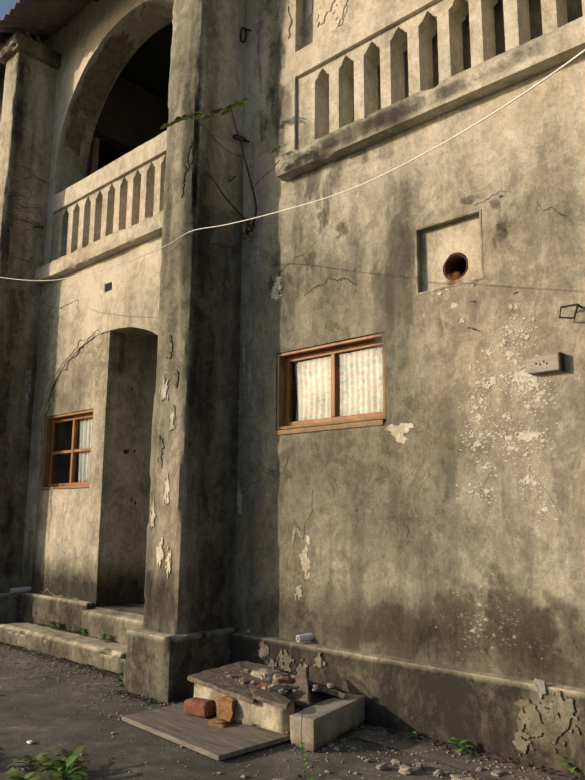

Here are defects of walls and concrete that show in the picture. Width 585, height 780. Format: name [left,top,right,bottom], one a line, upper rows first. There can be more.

flaking render [64,30,135,156]
spalling [268,274,283,302]
crack [304,278,358,296]
crack [45,332,104,418]
flaking render [159,366,179,432]
spalling [385,420,415,444]
peeling [456,303,559,525]
flaking render [150,435,170,528]
flaking render [156,536,172,578]
water stain [288,526,312,601]
flaking render [256,640,327,676]
flaking render [512,684,580,756]